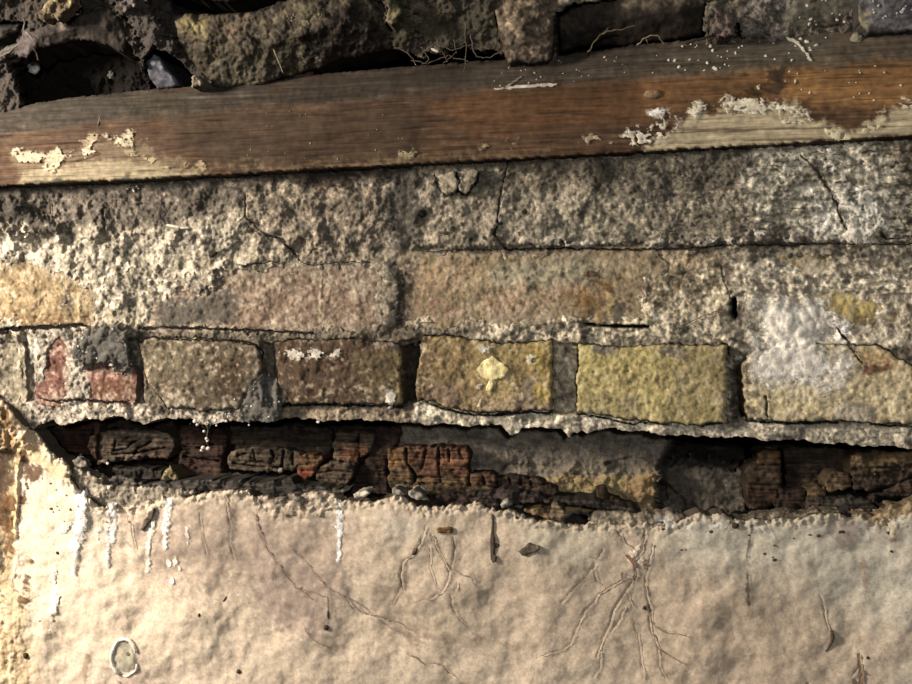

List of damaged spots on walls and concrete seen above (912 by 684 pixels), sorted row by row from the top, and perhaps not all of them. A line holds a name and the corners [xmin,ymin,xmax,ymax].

crack [232,194,371,266]
crack [426,154,912,330]
damp [57,489,117,576]
spalling [71,455,201,509]
damp [145,498,181,585]
spalling [257,487,375,517]
damp [334,500,344,563]
spalling [392,483,429,500]
spalling [588,507,685,531]
spalling [729,495,912,551]
crack [253,513,474,677]
crack [541,530,687,678]